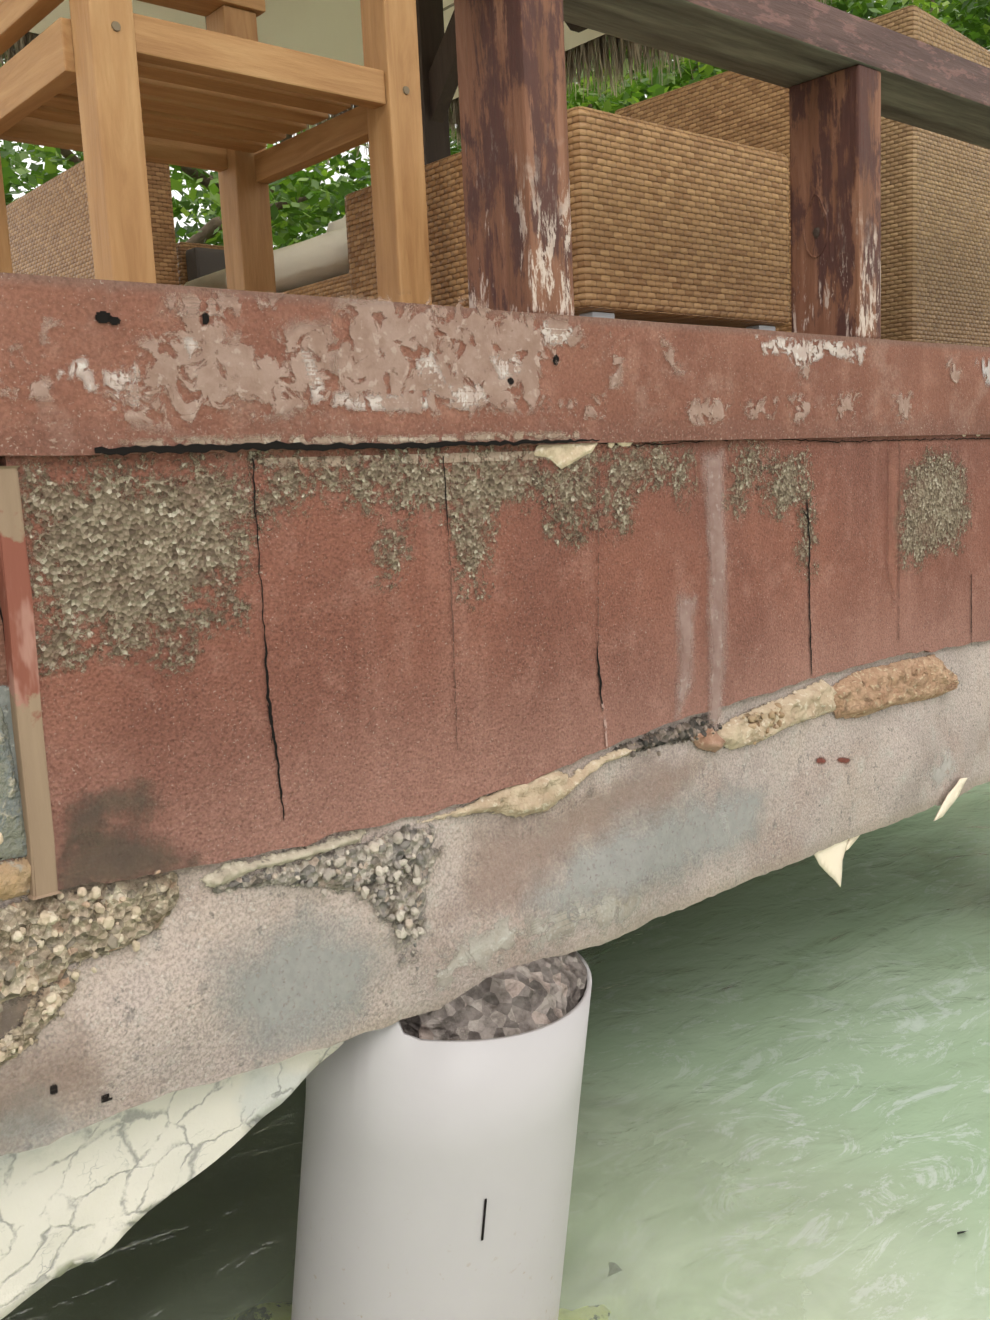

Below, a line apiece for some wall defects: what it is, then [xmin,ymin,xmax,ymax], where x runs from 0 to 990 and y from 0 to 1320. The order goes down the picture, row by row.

peeling [1,294,581,426]
peeling [561,355,622,417]
peeling [687,400,728,423]
peeling [745,396,810,422]
crack [94,433,990,819]
spalling [614,654,959,758]
spalling [0,685,179,1067]
spalling [212,823,441,971]